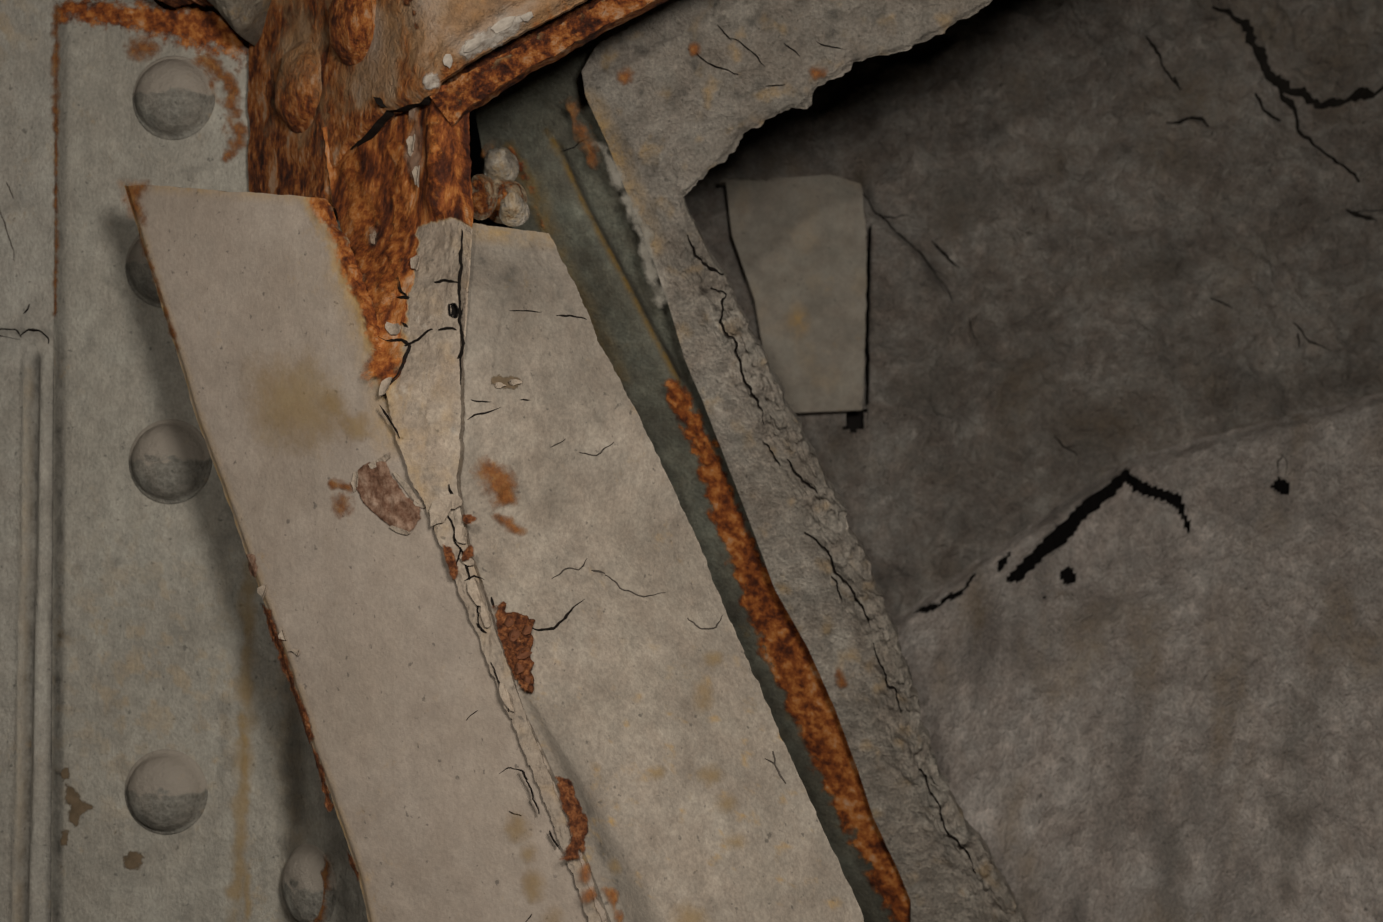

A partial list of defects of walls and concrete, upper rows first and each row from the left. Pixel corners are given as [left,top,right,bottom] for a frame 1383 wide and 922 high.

rust [52,0,248,314]
rust [125,181,177,349]
rust [337,141,407,382]
crack [378,230,530,438]
crack [687,235,817,493]
crack [1212,6,1383,221]
rust [246,554,334,812]
spalling [351,452,426,535]
crack [429,484,515,721]
crack [532,559,666,631]
rust [665,379,910,922]
crack [913,467,1192,614]